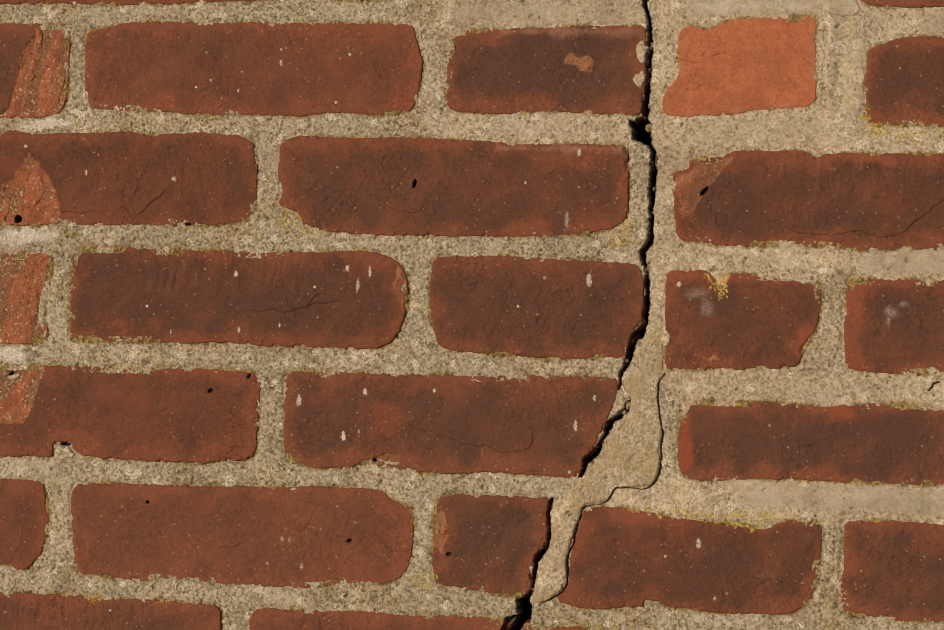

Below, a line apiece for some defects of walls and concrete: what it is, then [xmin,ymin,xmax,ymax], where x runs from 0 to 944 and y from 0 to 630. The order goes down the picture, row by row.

spalling [0,153,62,226]
spalling [0,23,71,119]
crack [578,0,659,479]
crack [501,374,665,630]